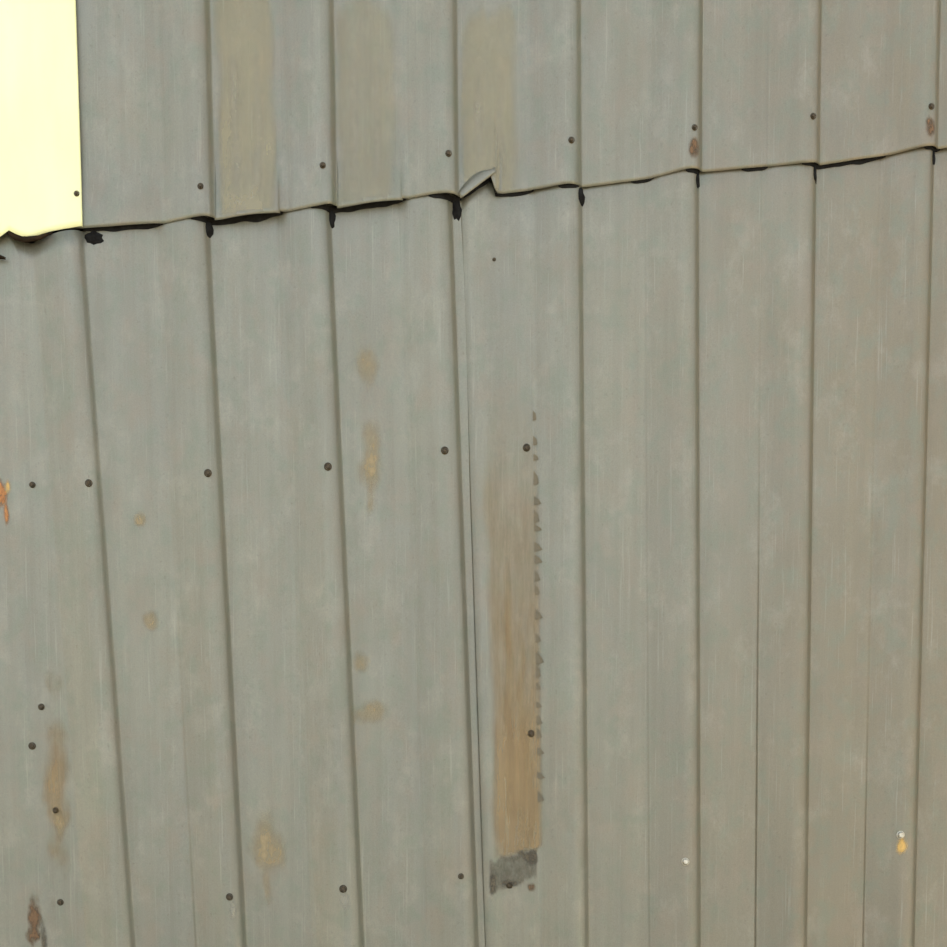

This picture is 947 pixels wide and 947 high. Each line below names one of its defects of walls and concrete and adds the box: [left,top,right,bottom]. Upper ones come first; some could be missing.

corrosion [0,482,9,522]
corrosion [495,673,540,855]
corrosion [28,900,46,947]